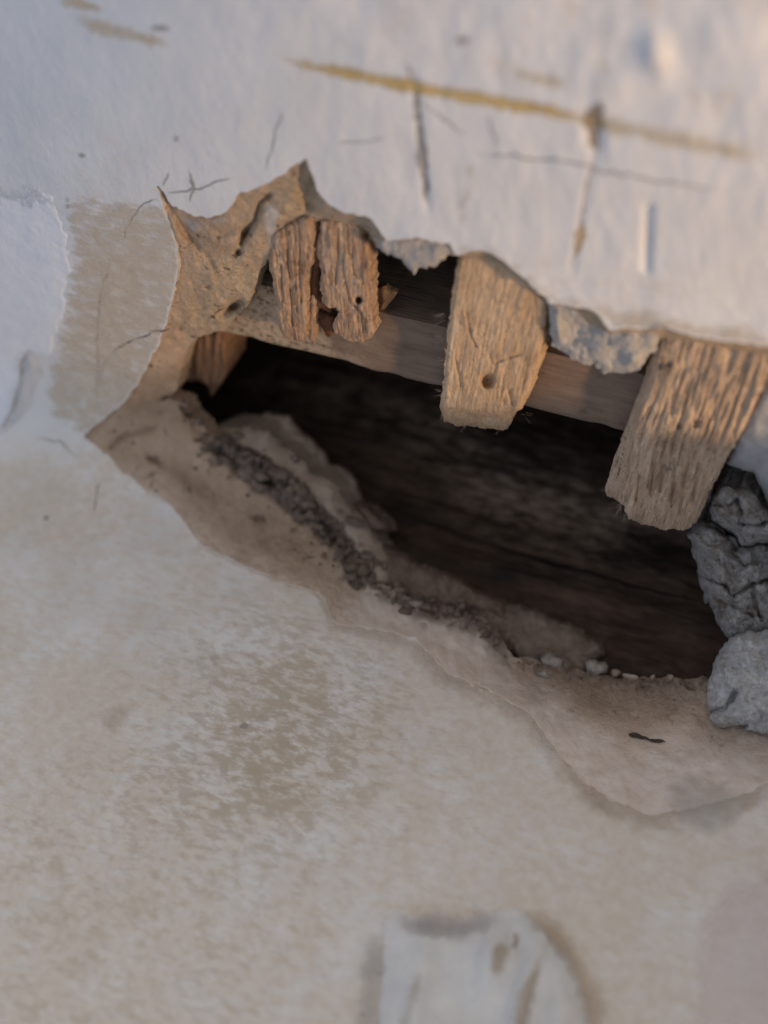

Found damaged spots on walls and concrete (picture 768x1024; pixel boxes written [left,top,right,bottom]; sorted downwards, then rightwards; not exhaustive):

spalling [85,159,768,819]